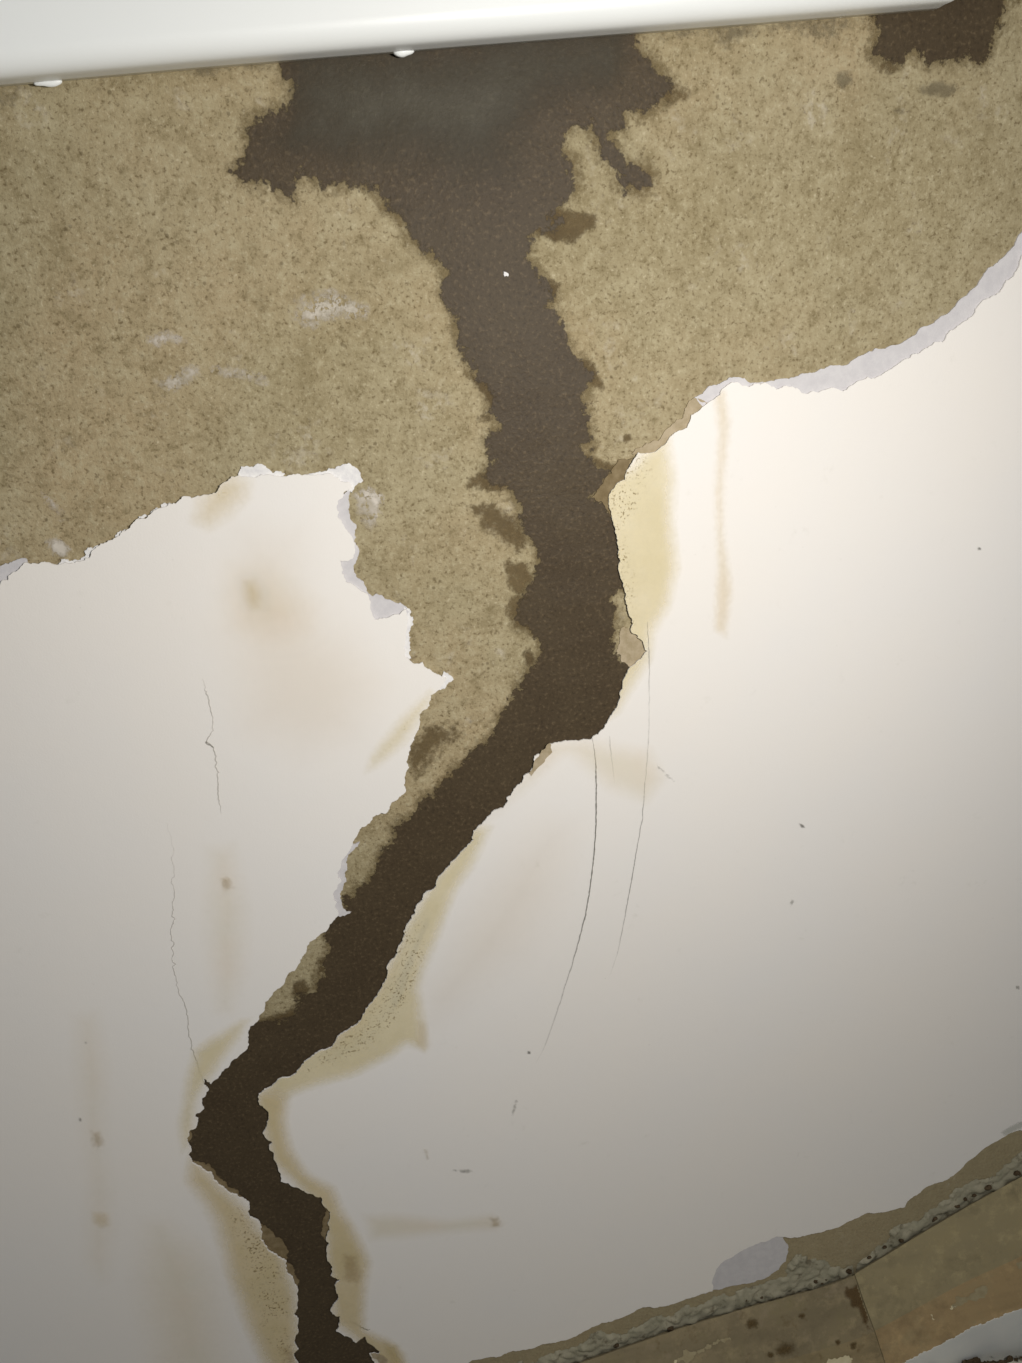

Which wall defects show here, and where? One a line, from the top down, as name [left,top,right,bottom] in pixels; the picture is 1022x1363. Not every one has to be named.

flaking render [526,0,1022,517]
flaking render [0,63,542,917]
flaking render [609,588,646,667]
leakage [189,34,688,1363]
crack [205,741,219,801]
flaking render [529,743,552,776]
flaking render [256,932,329,1023]
crack [178,990,205,1085]
flaking render [261,1224,299,1286]
flaking render [321,1208,330,1239]
flaking render [469,1122,1022,1363]